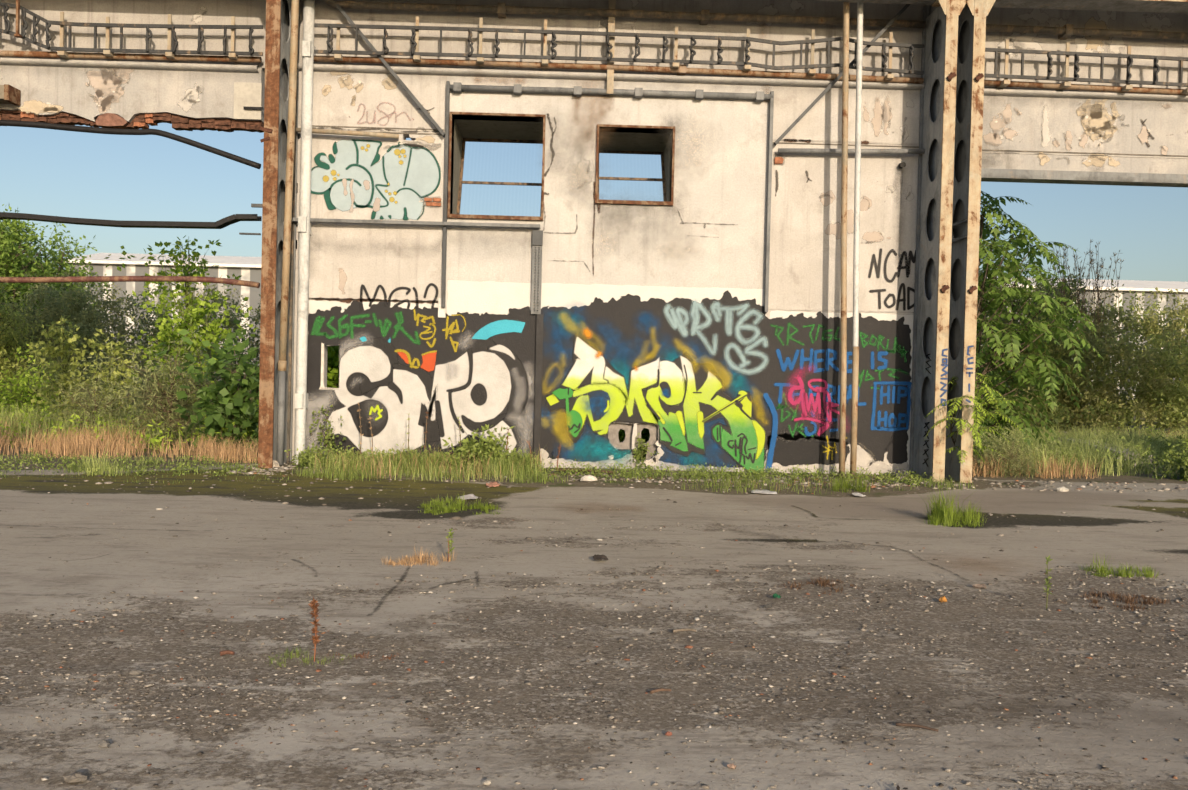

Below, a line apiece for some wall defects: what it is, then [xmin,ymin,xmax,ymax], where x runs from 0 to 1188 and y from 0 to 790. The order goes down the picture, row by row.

spalling [0,59,264,133]
peeling [983,104,1022,146]
peeling [1038,99,1120,167]